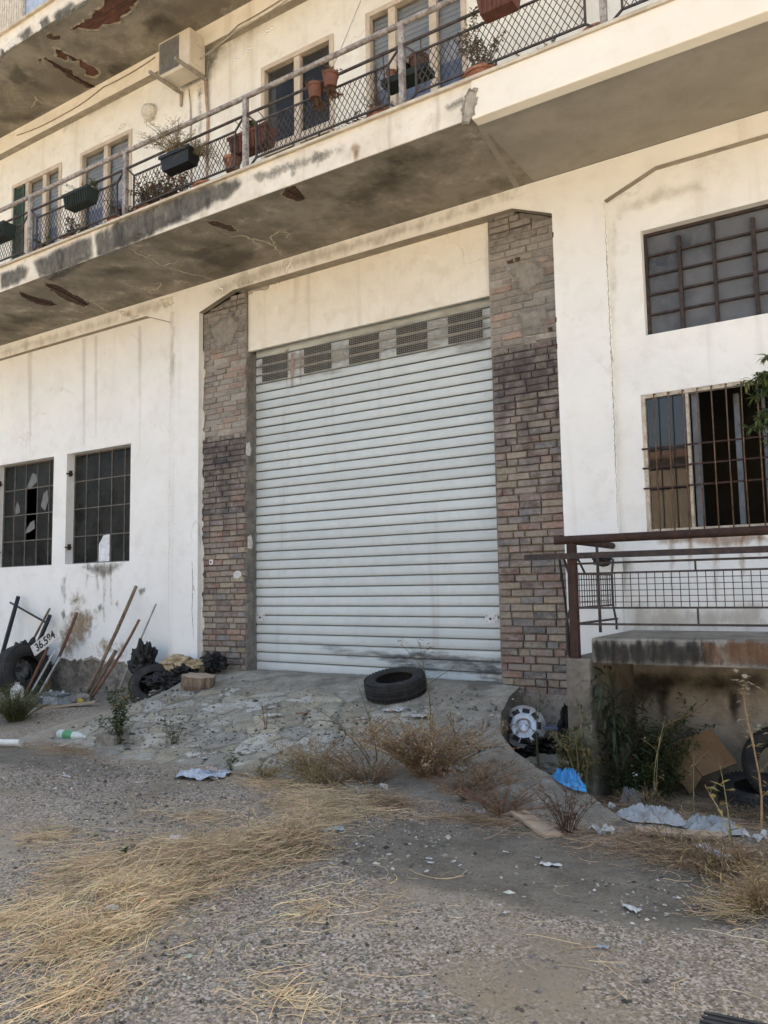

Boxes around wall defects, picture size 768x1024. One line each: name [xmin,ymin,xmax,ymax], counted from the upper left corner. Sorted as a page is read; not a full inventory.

peeling [2,36,18,52]
spalling [36,0,139,89]
spalling [448,87,478,125]
damp [255,166,286,180]
spalling [280,185,306,202]
damp [1,180,240,288]
spalling [205,220,238,232]
spalling [19,281,92,308]
damp [89,565,117,575]
rust [704,642,768,664]
damp [593,641,712,715]
damp [696,676,758,715]